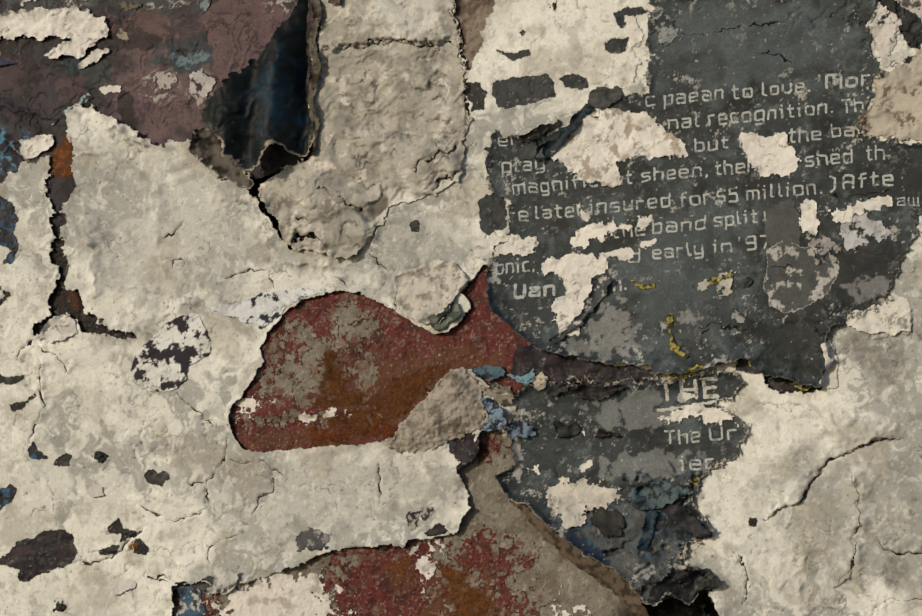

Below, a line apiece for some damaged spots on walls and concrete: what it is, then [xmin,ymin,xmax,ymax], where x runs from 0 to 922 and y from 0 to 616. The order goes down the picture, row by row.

crack [248,189,321,250]
peeling [0,0,654,616]
corrosion [309,345,450,444]
peeling [666,314,705,380]
peeling [736,338,839,394]
peeling [845,292,912,336]
crack [68,392,282,566]
peeling [625,475,712,550]
crack [763,438,901,521]
crack [835,480,922,588]
peeling [702,591,719,616]
crack [738,554,749,602]